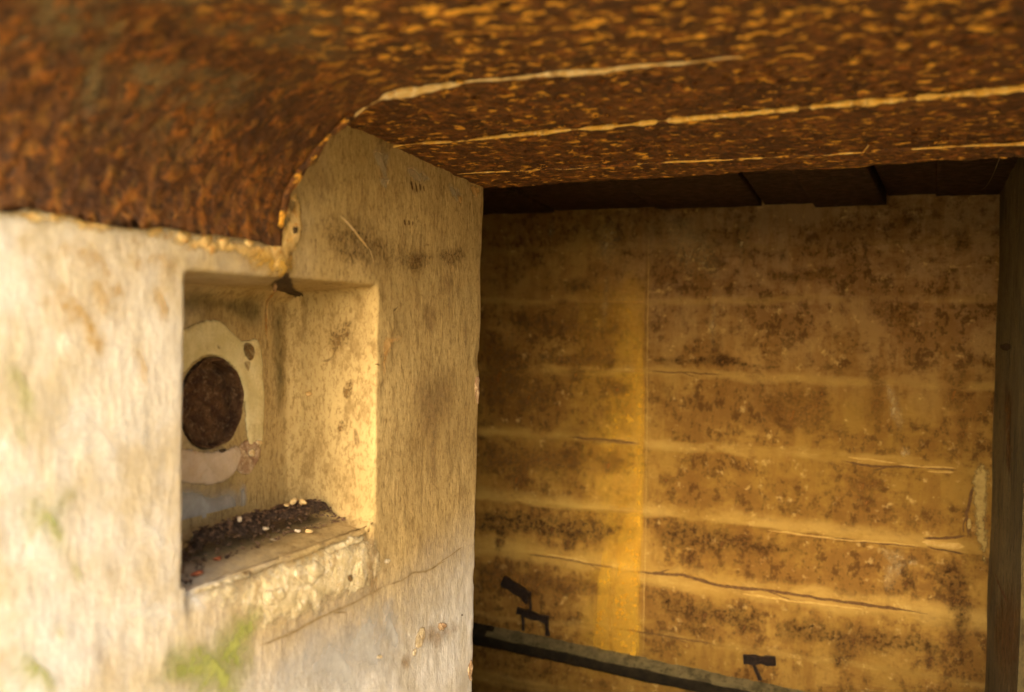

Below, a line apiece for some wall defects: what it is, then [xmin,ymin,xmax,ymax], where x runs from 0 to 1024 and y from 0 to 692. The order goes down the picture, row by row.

crack [769,457,973,554]
crack [259,547,462,646]
damp [479,491,641,655]
damp [663,598,755,634]
damp [662,523,787,562]
crack [525,553,925,614]
damp [777,619,936,668]